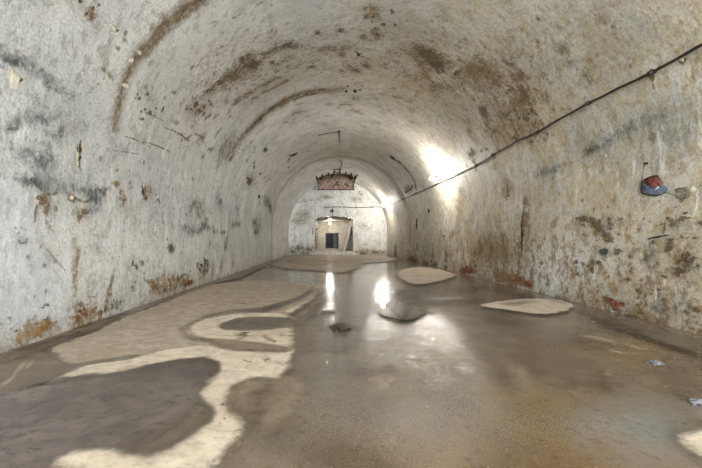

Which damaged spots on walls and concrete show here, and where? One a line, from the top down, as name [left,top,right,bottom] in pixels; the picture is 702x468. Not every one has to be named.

water stain [0,45,34,68]
water stain [117,0,203,110]
water stain [186,43,302,125]
water stain [412,44,511,94]
crack [502,178,529,258]
spalling [564,216,702,329]
spalling [11,304,57,345]